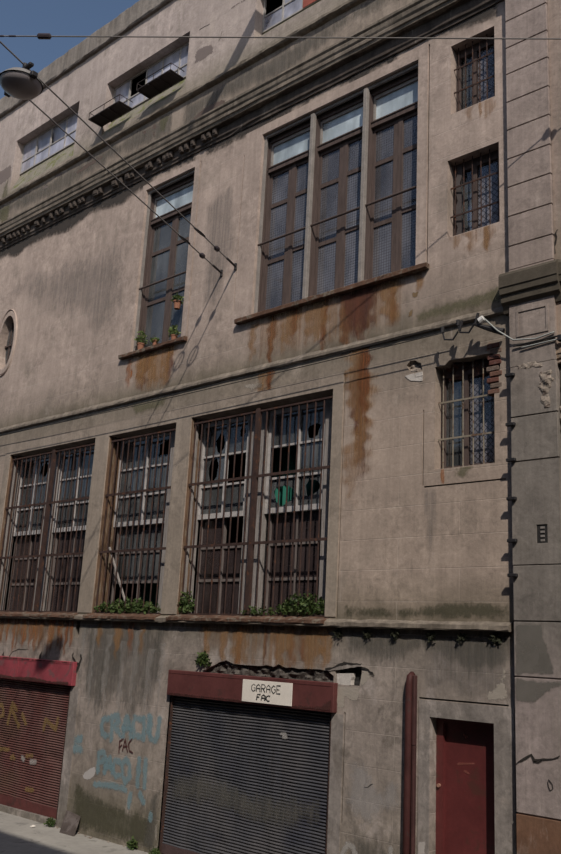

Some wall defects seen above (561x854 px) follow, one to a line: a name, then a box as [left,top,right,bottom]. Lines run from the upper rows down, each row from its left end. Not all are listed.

rust [340,280,397,343]
rust [259,299,328,391]
spalling [405,361,423,381]
spalling [446,342,502,397]
rust [346,347,372,466]
rust [0,619,74,663]
spalling [205,661,373,708]
crack [516,754,560,791]